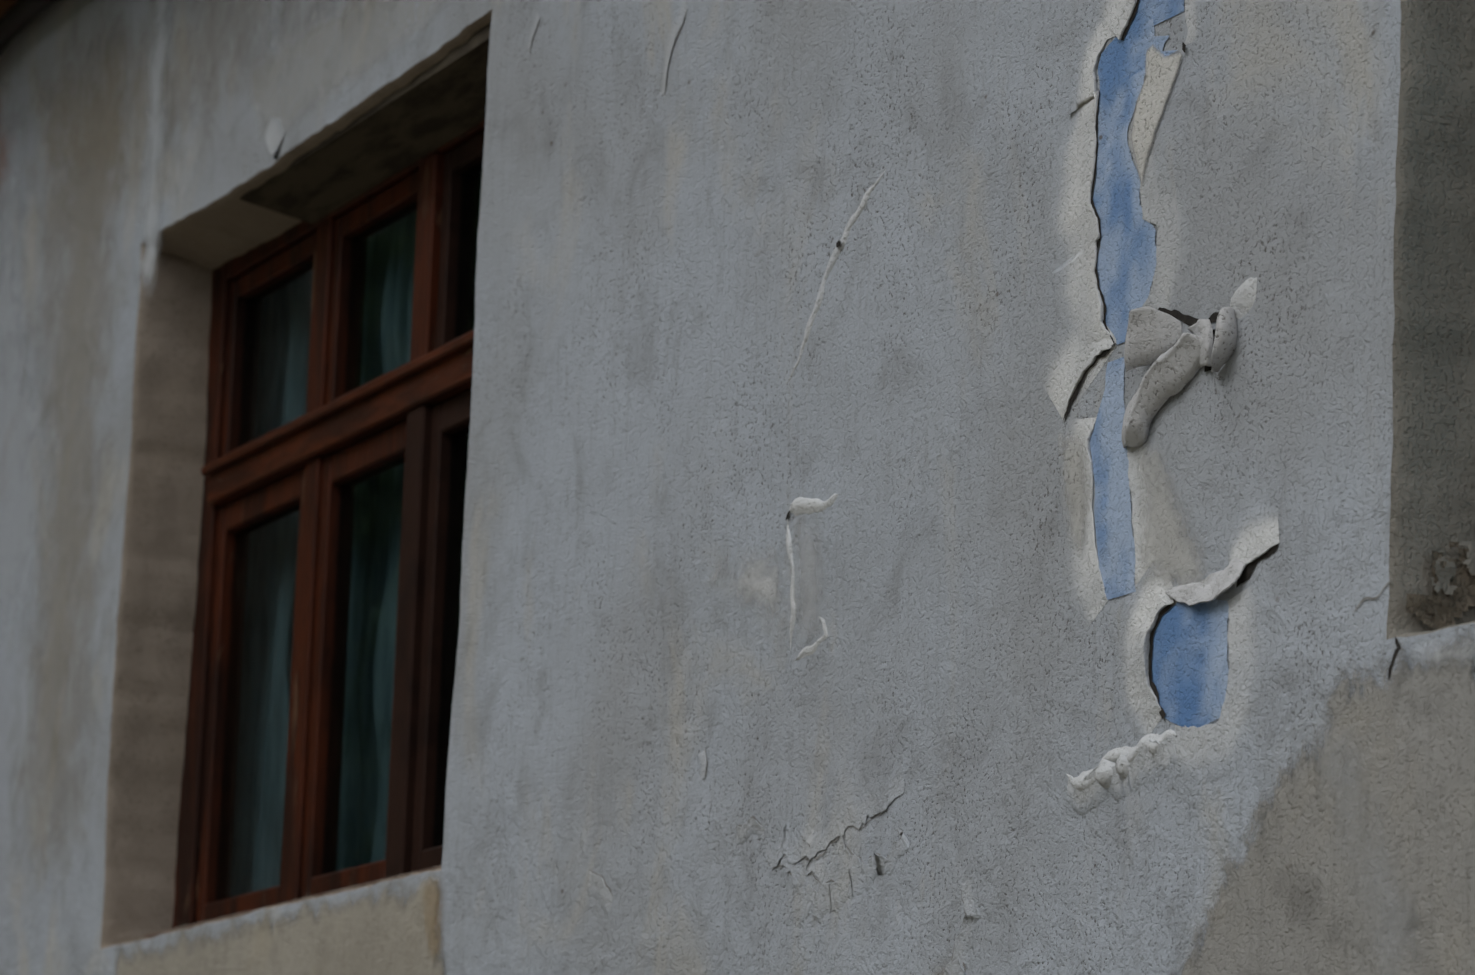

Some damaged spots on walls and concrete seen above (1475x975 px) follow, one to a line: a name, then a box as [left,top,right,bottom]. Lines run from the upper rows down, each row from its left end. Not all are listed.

crack [786,169,886,384]
peeling [1114,504,1280,786]
crack [765,760,911,926]